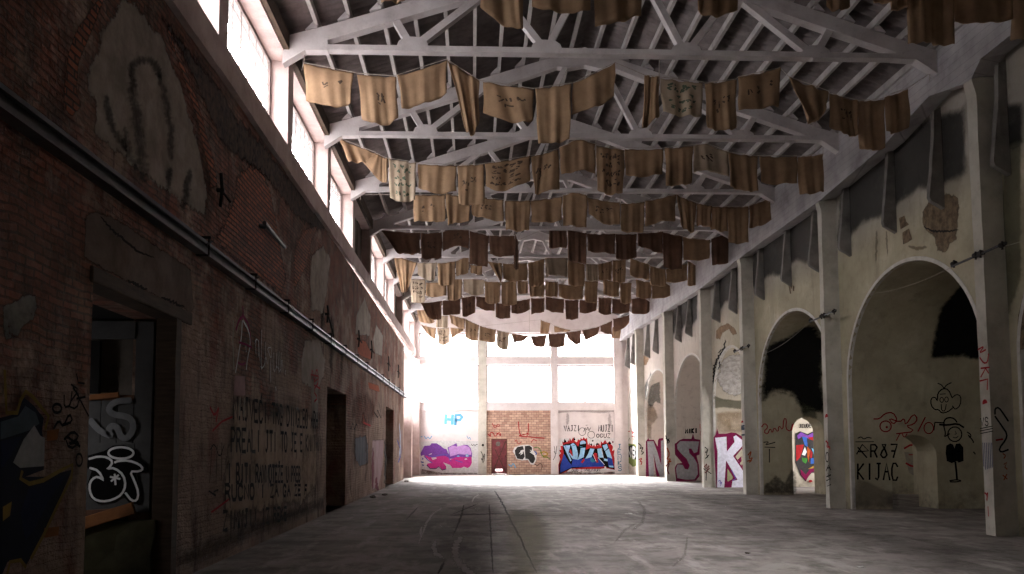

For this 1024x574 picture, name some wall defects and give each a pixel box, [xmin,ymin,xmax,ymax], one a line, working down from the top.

spalling [162,17,325,231]
spalling [899,216,912,244]
spalling [922,194,959,252]